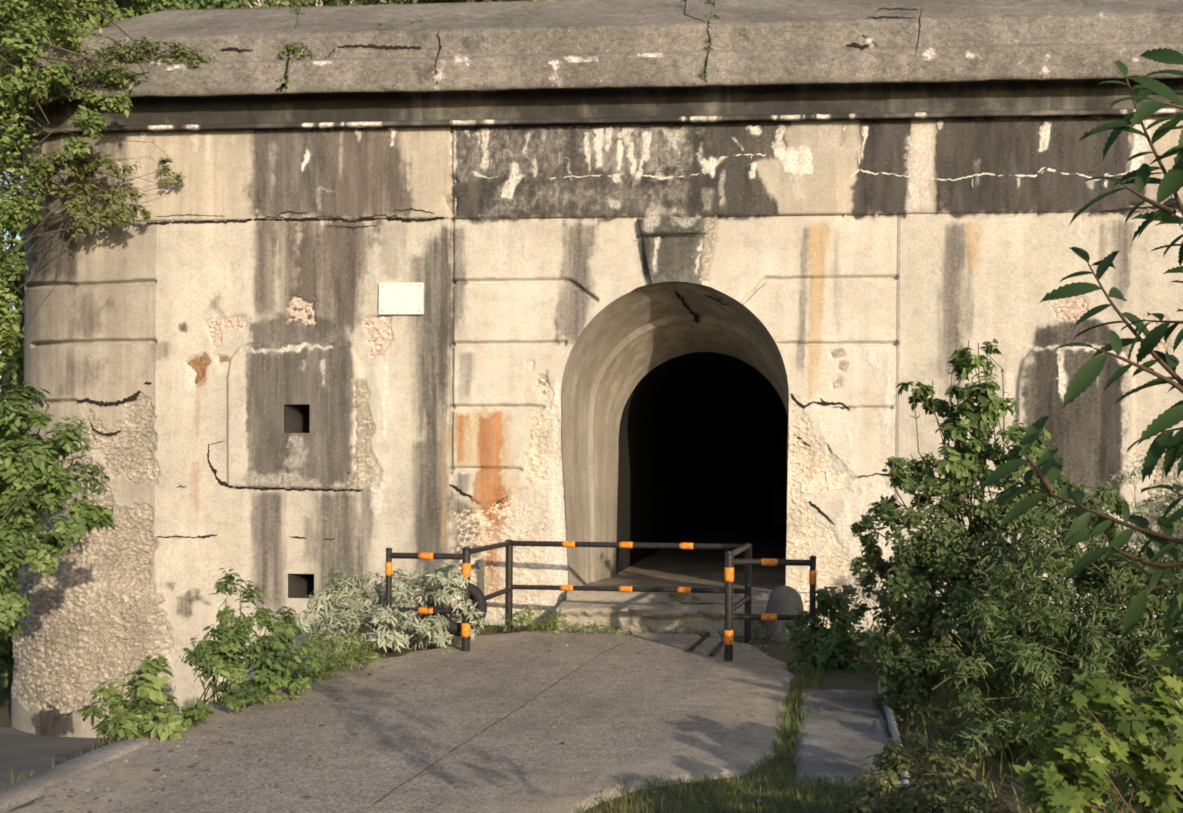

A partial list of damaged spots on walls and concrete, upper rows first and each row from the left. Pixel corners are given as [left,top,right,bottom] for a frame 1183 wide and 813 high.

spalling [22,393,159,598]
crack [207,441,362,492]
damp [246,122,412,617]
rust [459,412,509,578]
spalling [452,362,569,625]
damp [416,115,813,575]
crack [674,291,731,324]
spalling [787,396,898,628]
damp [843,109,1175,375]
crack [851,145,1183,227]
damp [1004,319,1130,504]
flaking render [1048,296,1088,322]